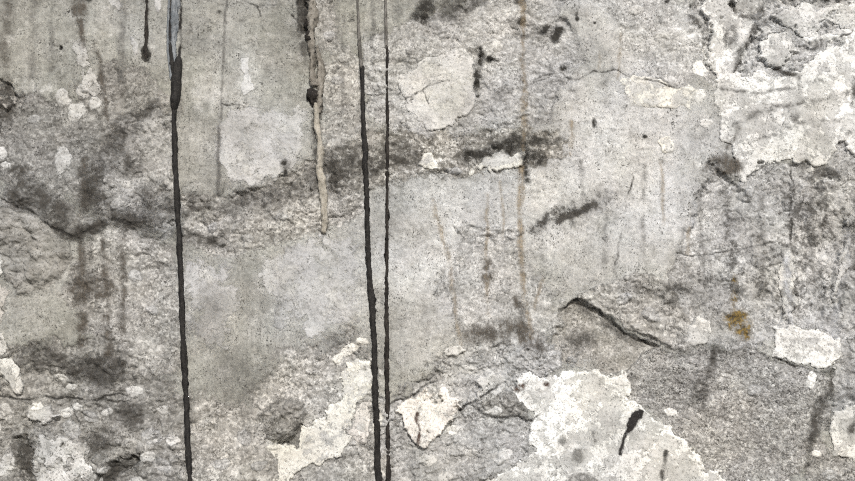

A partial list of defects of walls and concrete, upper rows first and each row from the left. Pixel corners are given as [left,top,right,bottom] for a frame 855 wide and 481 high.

spalling [0,0,369,481]
leakage [412,0,484,23]
spalling [258,0,693,481]
crack [567,298,648,345]
spalling [486,0,855,481]
leakage [724,0,764,71]